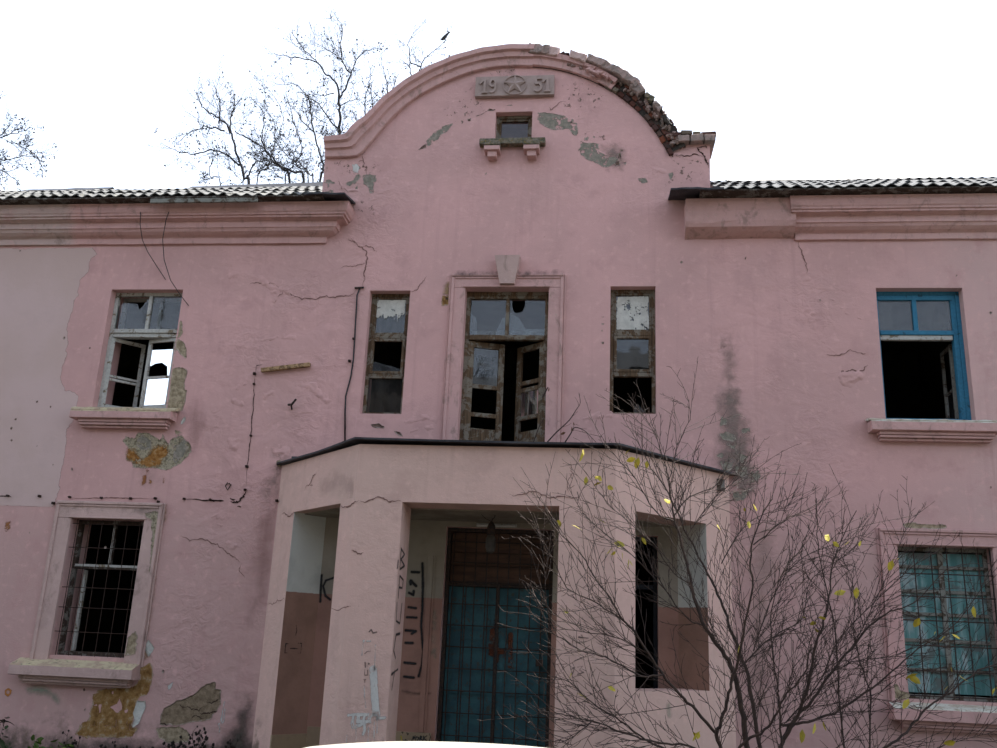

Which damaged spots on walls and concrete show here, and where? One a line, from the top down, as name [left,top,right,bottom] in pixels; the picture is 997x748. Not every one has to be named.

peeling [419,99,495,150]
flaking render [537,63,716,182]
crack [249,238,375,300]
peeling [123,321,192,485]
water stain [716,394,761,501]
crack [342,496,400,508]
crack [184,537,244,576]
peeling [75,640,171,739]
flaking render [156,682,221,743]